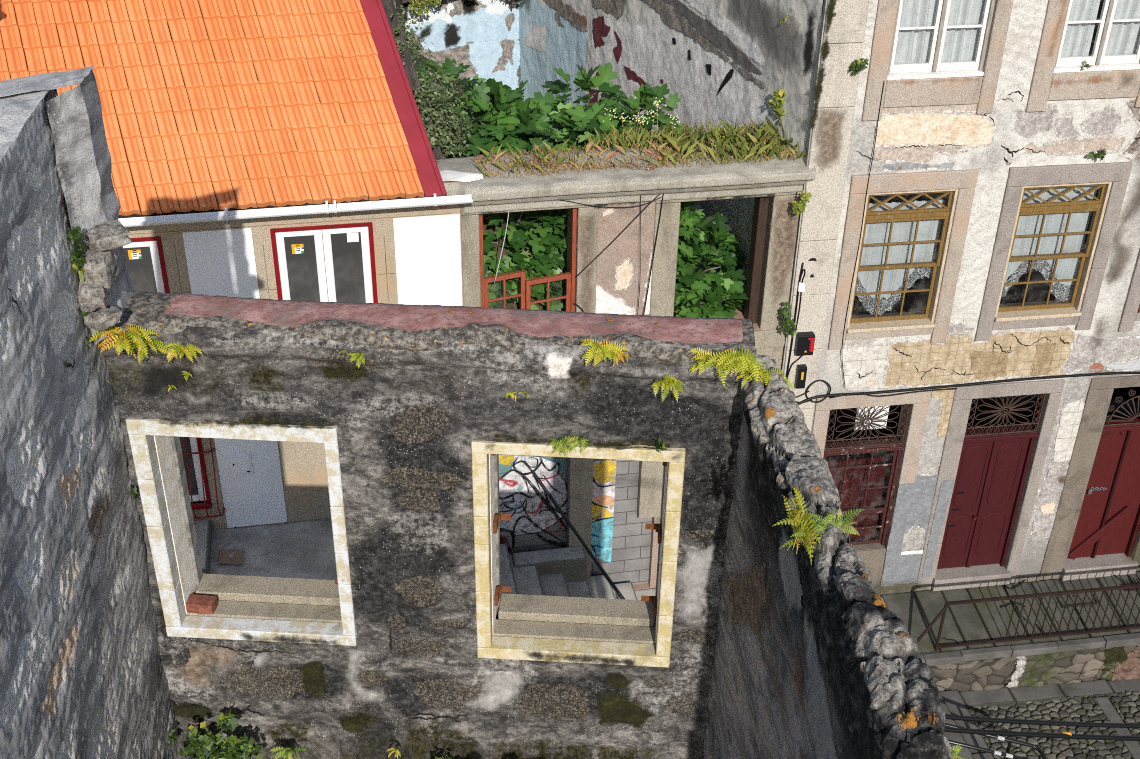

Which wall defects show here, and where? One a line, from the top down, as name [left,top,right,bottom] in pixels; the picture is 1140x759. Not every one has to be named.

peeling [405,0,773,132]
crack [857,144,966,161]
spalling [870,104,996,172]
crack [980,90,1045,165]
flaking render [1011,99,1140,161]
crack [893,348,973,380]
peeling [839,321,1140,438]
crack [993,334,1069,353]
spalling [902,526,925,551]